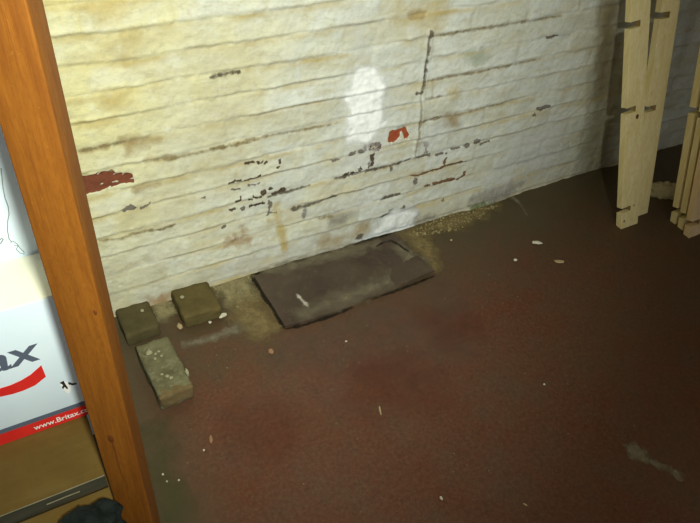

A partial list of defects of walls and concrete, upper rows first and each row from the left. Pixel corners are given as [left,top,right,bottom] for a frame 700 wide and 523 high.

water stain [343,66,388,145]
peeling [342,127,410,178]
spalling [416,138,490,158]
peeling [82,170,135,194]
spalling [228,174,286,216]
spalling [413,171,466,187]